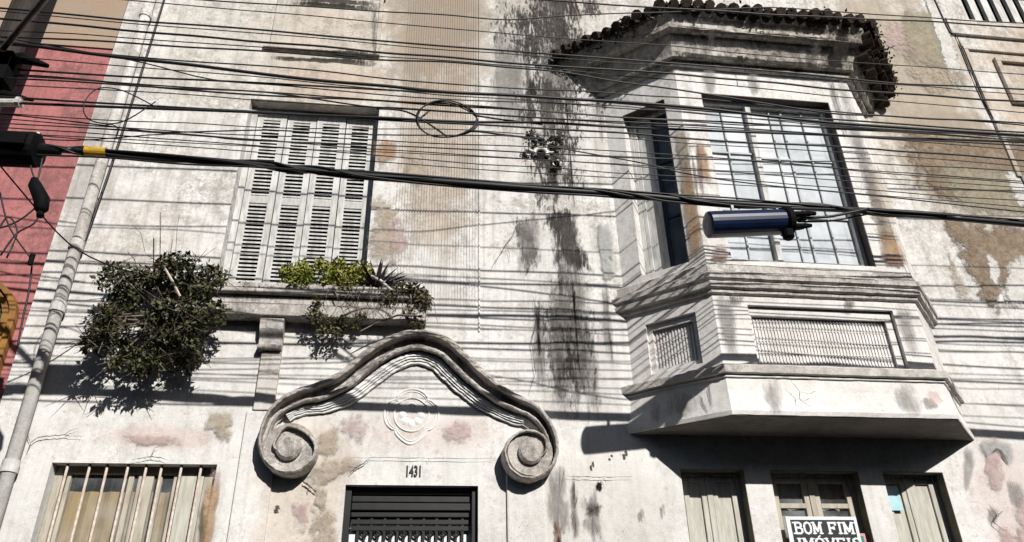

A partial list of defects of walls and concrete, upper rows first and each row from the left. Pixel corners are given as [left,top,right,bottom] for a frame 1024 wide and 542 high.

water stain [491,0,612,418]
flaking render [904,133,1024,314]
water stain [550,478,602,542]
peeling [982,439,1024,542]